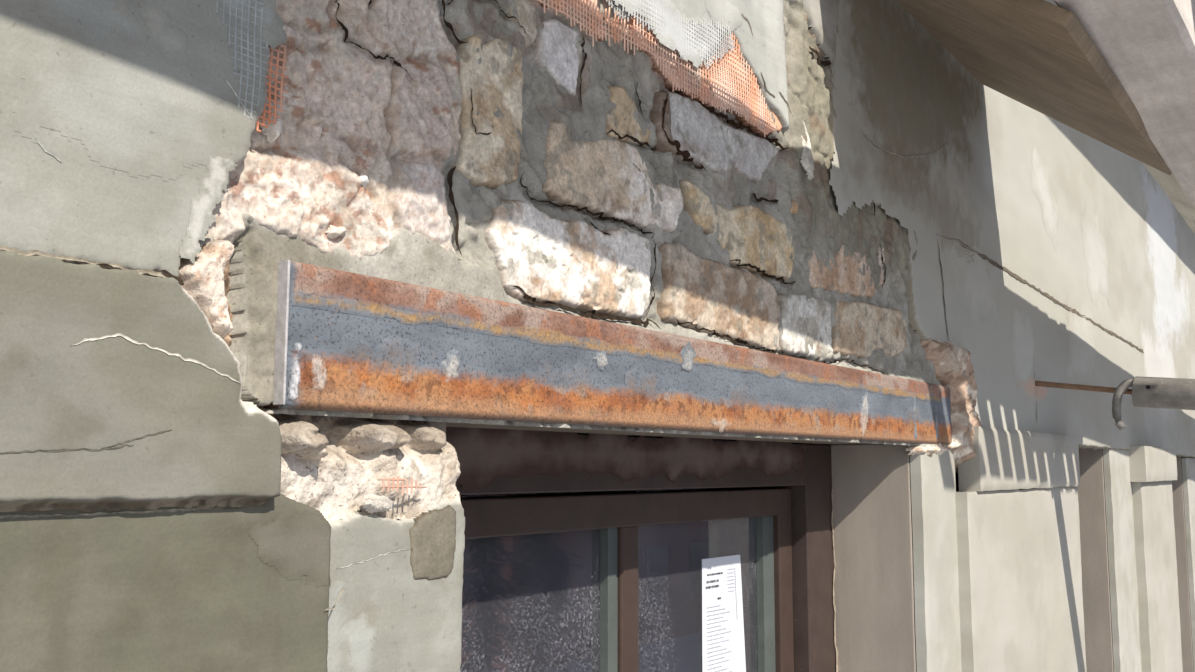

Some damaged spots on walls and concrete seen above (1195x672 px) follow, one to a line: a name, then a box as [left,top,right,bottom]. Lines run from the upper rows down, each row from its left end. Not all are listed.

flaking render [178,0,463,347]
flaking render [800,120,815,180]
crack [0,245,184,285]
crack [936,234,1144,353]
crack [0,430,170,454]
crack [70,333,241,383]
flaking render [258,406,464,524]
corrosion [284,261,952,445]
flaking render [906,339,982,474]